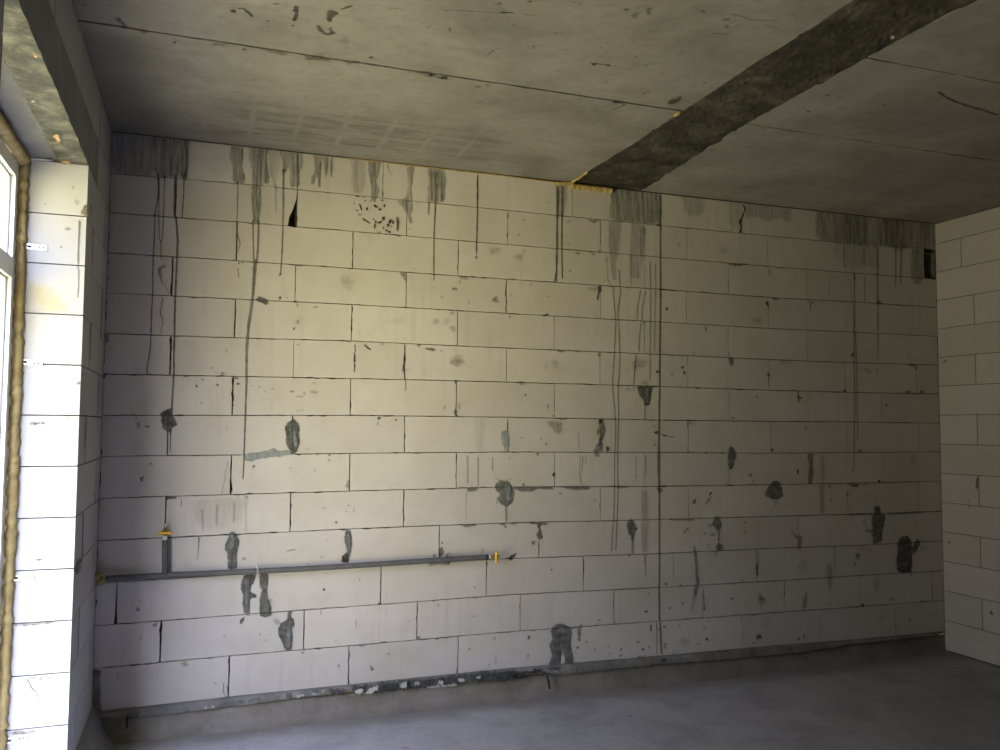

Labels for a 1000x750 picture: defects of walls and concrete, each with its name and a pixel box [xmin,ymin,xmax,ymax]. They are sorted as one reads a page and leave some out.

damp [146,138,188,408]
damp [428,171,446,280]
damp [554,187,563,282]